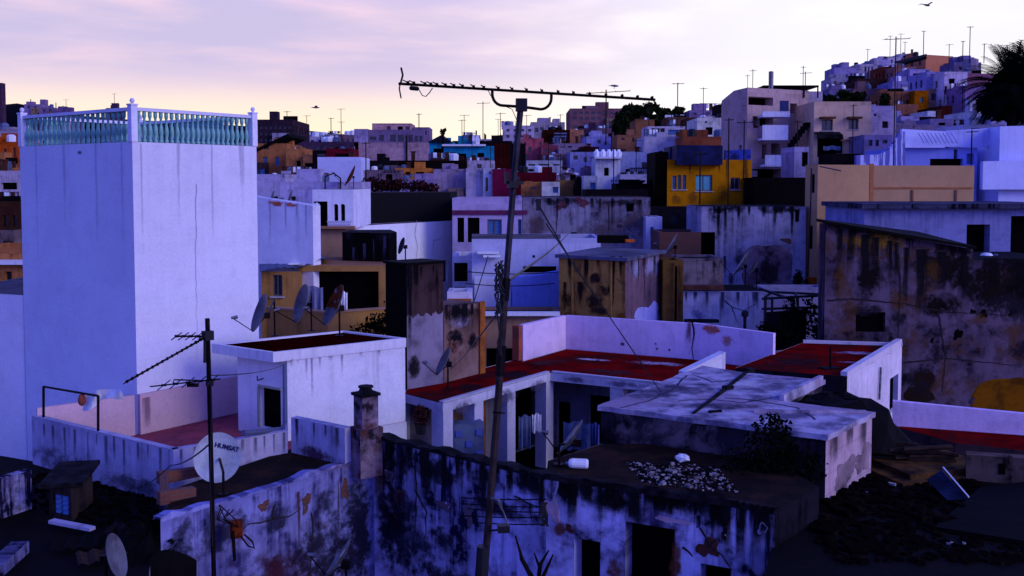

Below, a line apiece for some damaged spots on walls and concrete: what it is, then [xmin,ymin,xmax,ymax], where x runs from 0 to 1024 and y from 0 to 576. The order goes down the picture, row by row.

damp [710,190,799,234]
damp [562,254,663,315]
damp [445,303,476,351]
peeling [703,325,730,345]
damp [838,229,1024,394]
damp [43,424,124,466]
spalling [302,493,311,515]
spalling [341,478,349,500]
damp [256,439,775,576]
damp [170,519,192,555]
damp [204,510,246,552]
spalling [695,532,726,557]